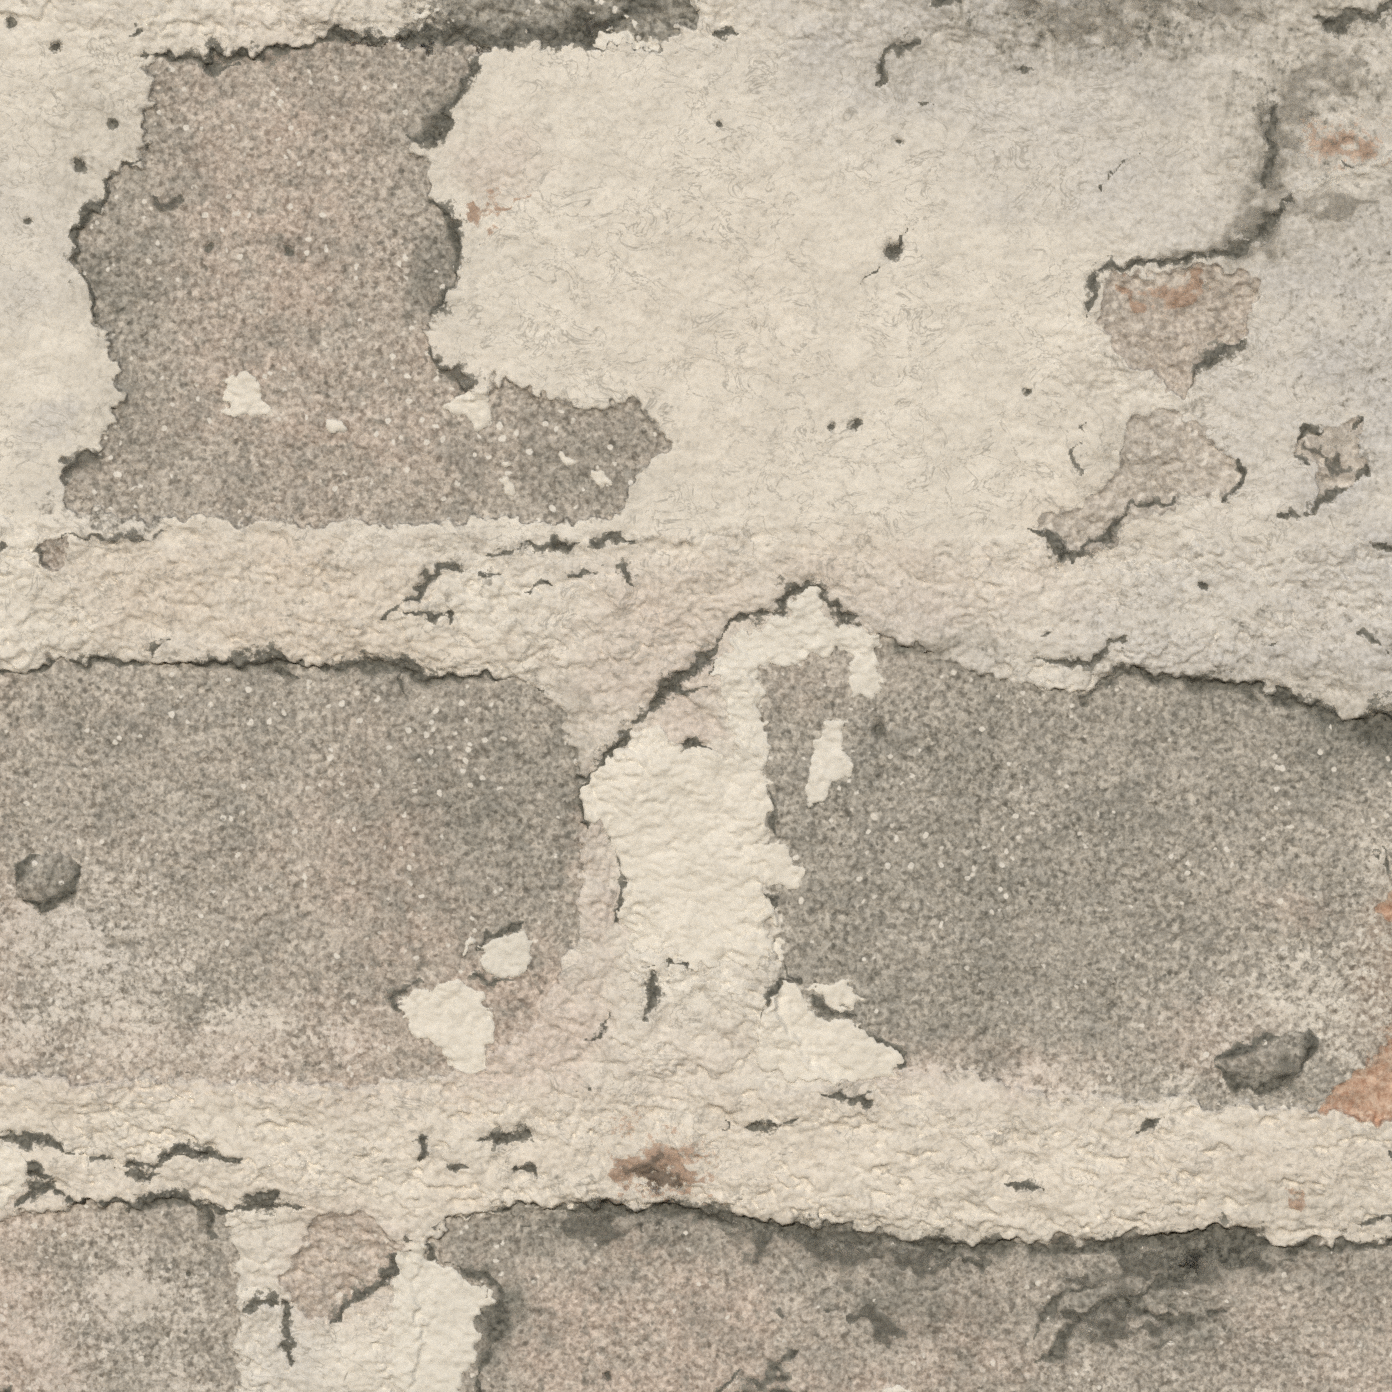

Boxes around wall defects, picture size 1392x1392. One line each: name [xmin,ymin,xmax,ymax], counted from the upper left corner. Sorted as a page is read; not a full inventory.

peeling [33,0,700,572]
spalling [1027,262,1261,564]
spalling [1294,417,1370,499]
crack [574,575,881,829]
crack [1033,632,1392,753]
crack [1356,627,1389,654]
crack [1371,846,1391,874]
spalling [1375,891,1392,922]
peeling [384,920,534,1074]
spalling [1318,1025,1392,1127]
peeling [278,1210,522,1392]
peeling [882,1384,911,1392]